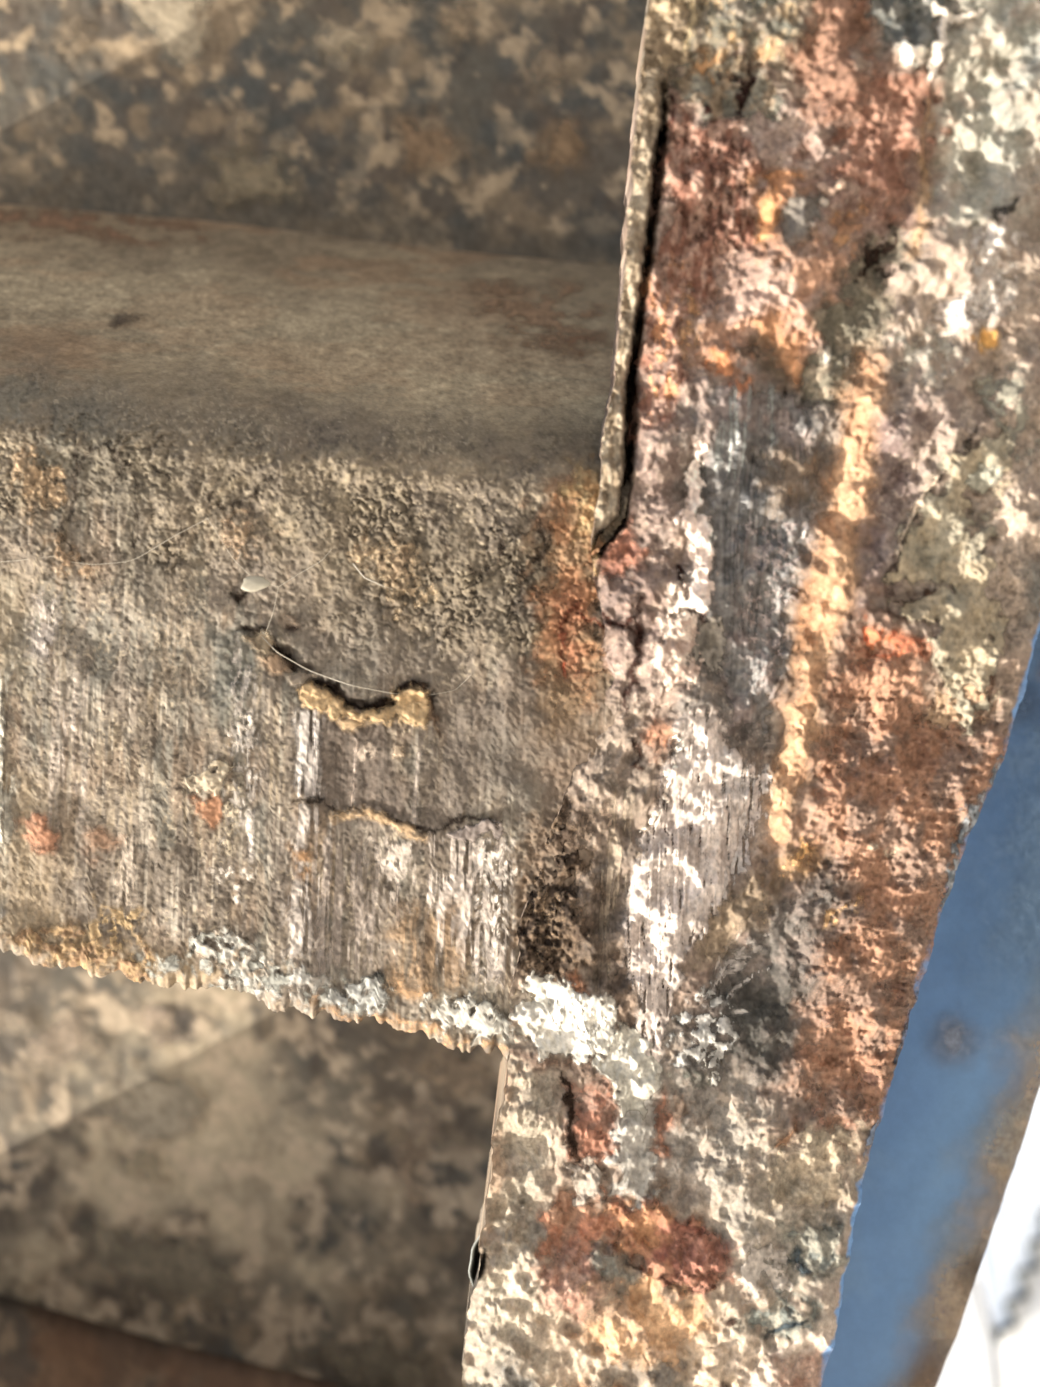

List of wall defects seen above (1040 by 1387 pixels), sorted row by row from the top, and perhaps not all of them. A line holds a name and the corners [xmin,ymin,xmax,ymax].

rust [627,0,951,441]
crack [591,95,675,559]
crack [54,440,171,563]
crack [242,625,441,737]
crack [293,797,504,842]
rust [530,466,607,730]
crack [622,620,645,771]
leakage [629,719,769,1033]
rust [767,352,1011,1143]
crack [560,1055,604,1171]
rust [564,1079,621,1167]
rust [536,1179,734,1365]